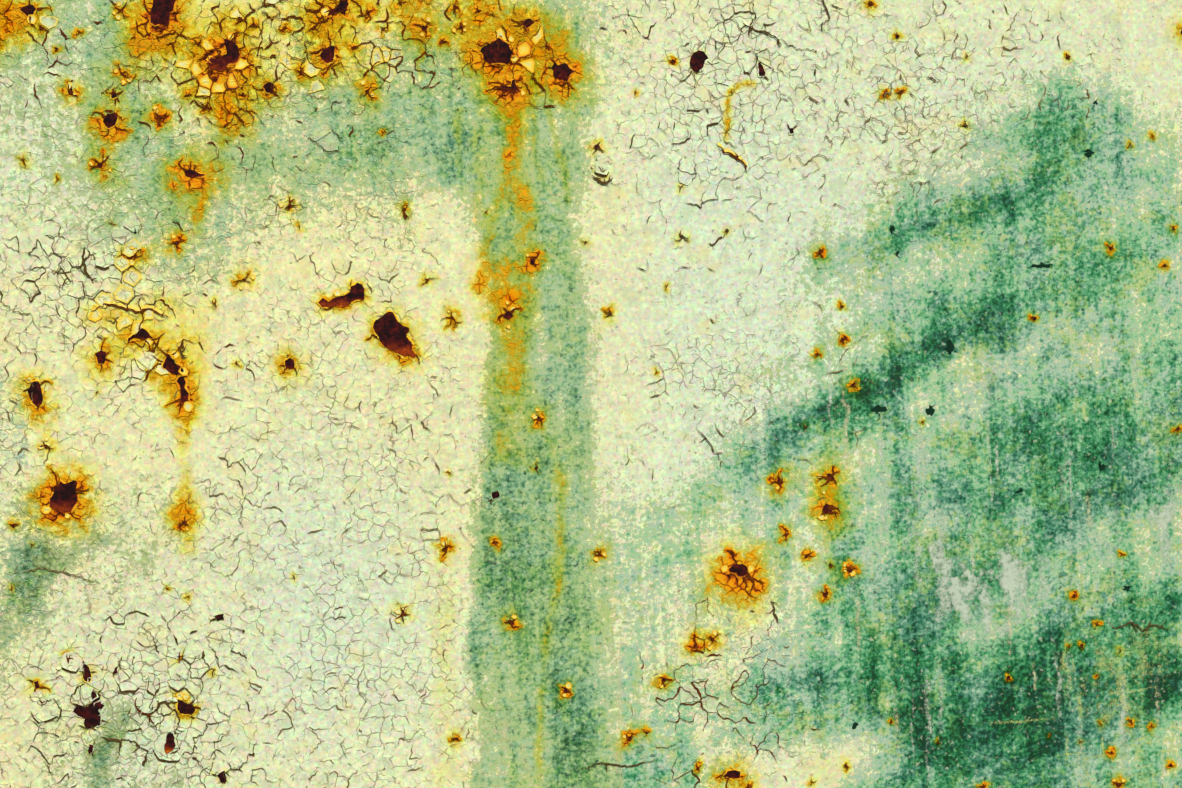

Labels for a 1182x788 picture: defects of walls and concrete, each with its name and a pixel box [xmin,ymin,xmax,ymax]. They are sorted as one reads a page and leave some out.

corrosion [392,0,574,69]
corrosion [146,103,173,131]
crack [0,0,1096,519]
corrosion [472,249,547,391]
crack [27,130,497,788]
corrosion [168,494,195,532]
corrosion [811,464,843,528]
crack [12,564,100,583]
peeling [31,690,58,728]
peeling [56,651,86,673]
peeling [112,660,159,717]
peeling [147,723,192,764]